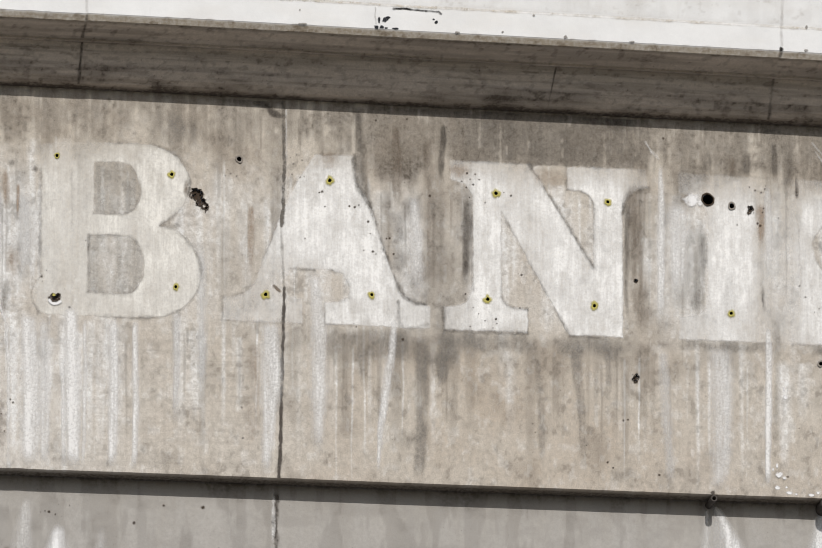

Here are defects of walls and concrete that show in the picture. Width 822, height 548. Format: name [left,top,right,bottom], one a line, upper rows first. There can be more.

spalling [189,188,209,212]
crack [267,105,286,227]
damp [411,202,422,283]
damp [658,172,703,305]
damp [21,317,49,458]
damp [60,310,87,460]
damp [109,322,118,461]
damp [263,326,280,464]
crack [273,287,286,541]
damp [311,278,326,437]
damp [377,325,403,463]
damp [713,346,735,479]